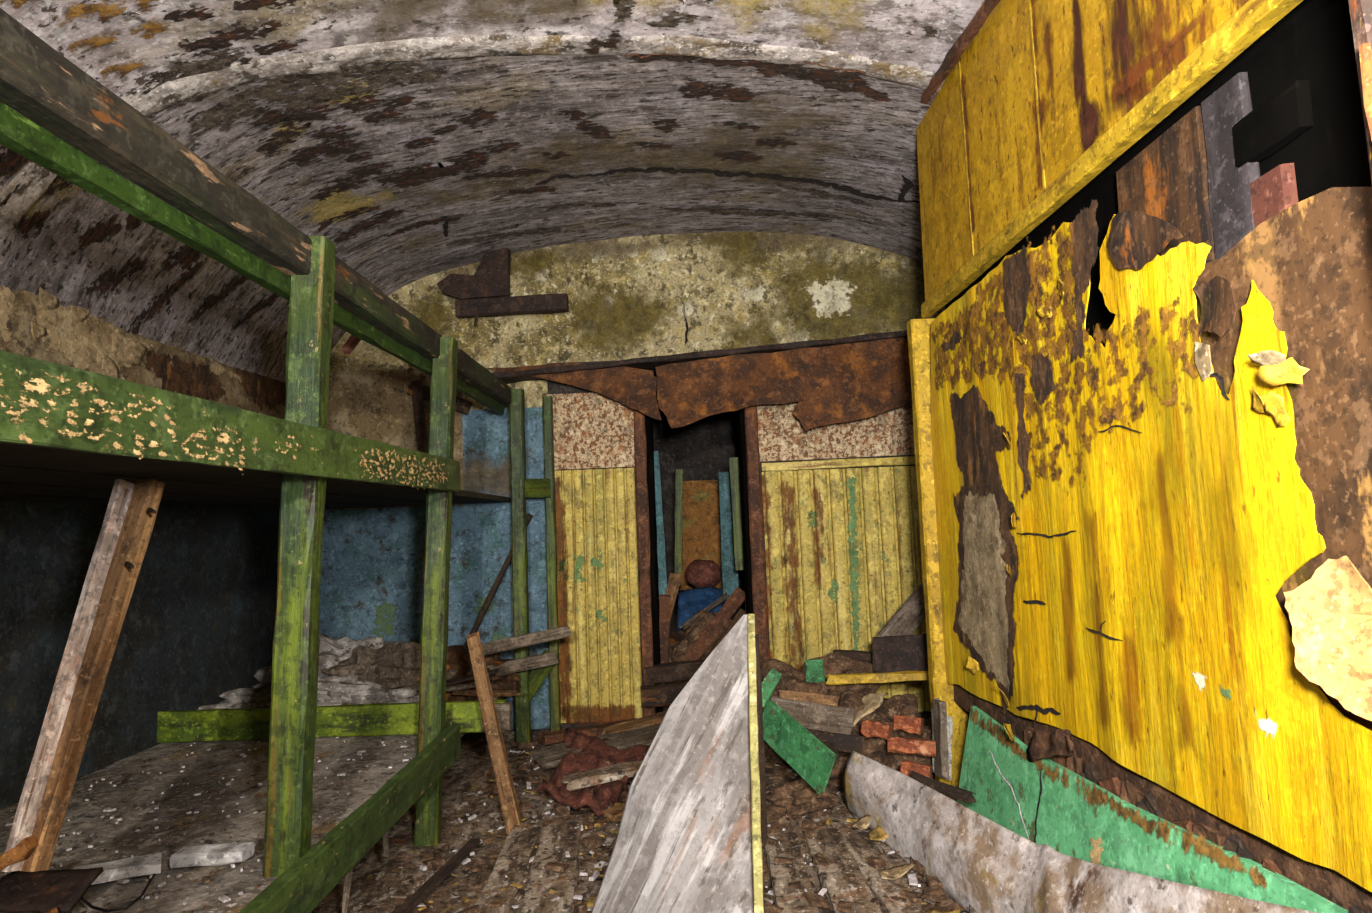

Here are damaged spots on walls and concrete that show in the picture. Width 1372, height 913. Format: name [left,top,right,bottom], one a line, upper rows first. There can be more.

corrosion [1073,0,1213,151]
leakage [501,100,834,186]
leakage [305,189,390,222]
leakage [510,240,653,274]
mould [574,288,664,348]
leakage [676,232,925,349]
peeling [1247,350,1310,426]
peeling [931,199,1267,888]